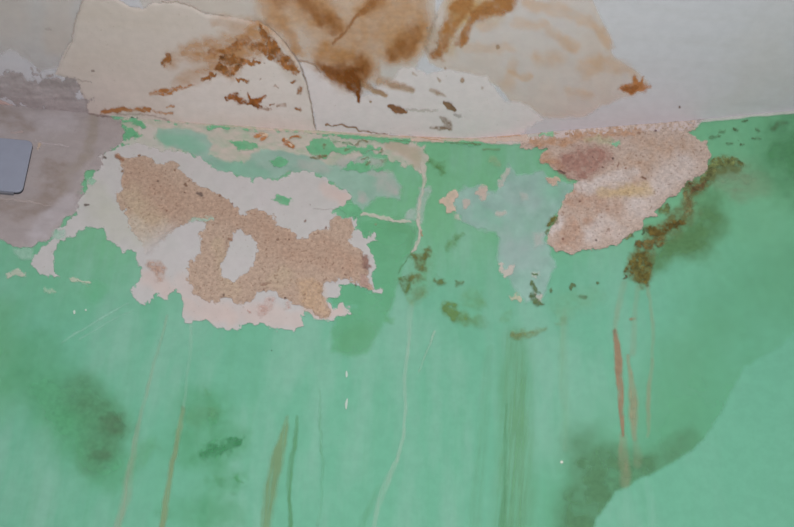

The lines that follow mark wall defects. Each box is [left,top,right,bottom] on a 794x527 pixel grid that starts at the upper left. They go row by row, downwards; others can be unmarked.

corrosion [101,105,175,114]
corrosion [224,93,273,109]
corrosion [181,0,514,103]
damp [382,0,647,117]
flaking render [17,0,794,331]
damp [624,156,756,286]
corrosion [613,329,636,436]
damp [659,376,722,454]
damp [563,447,657,527]